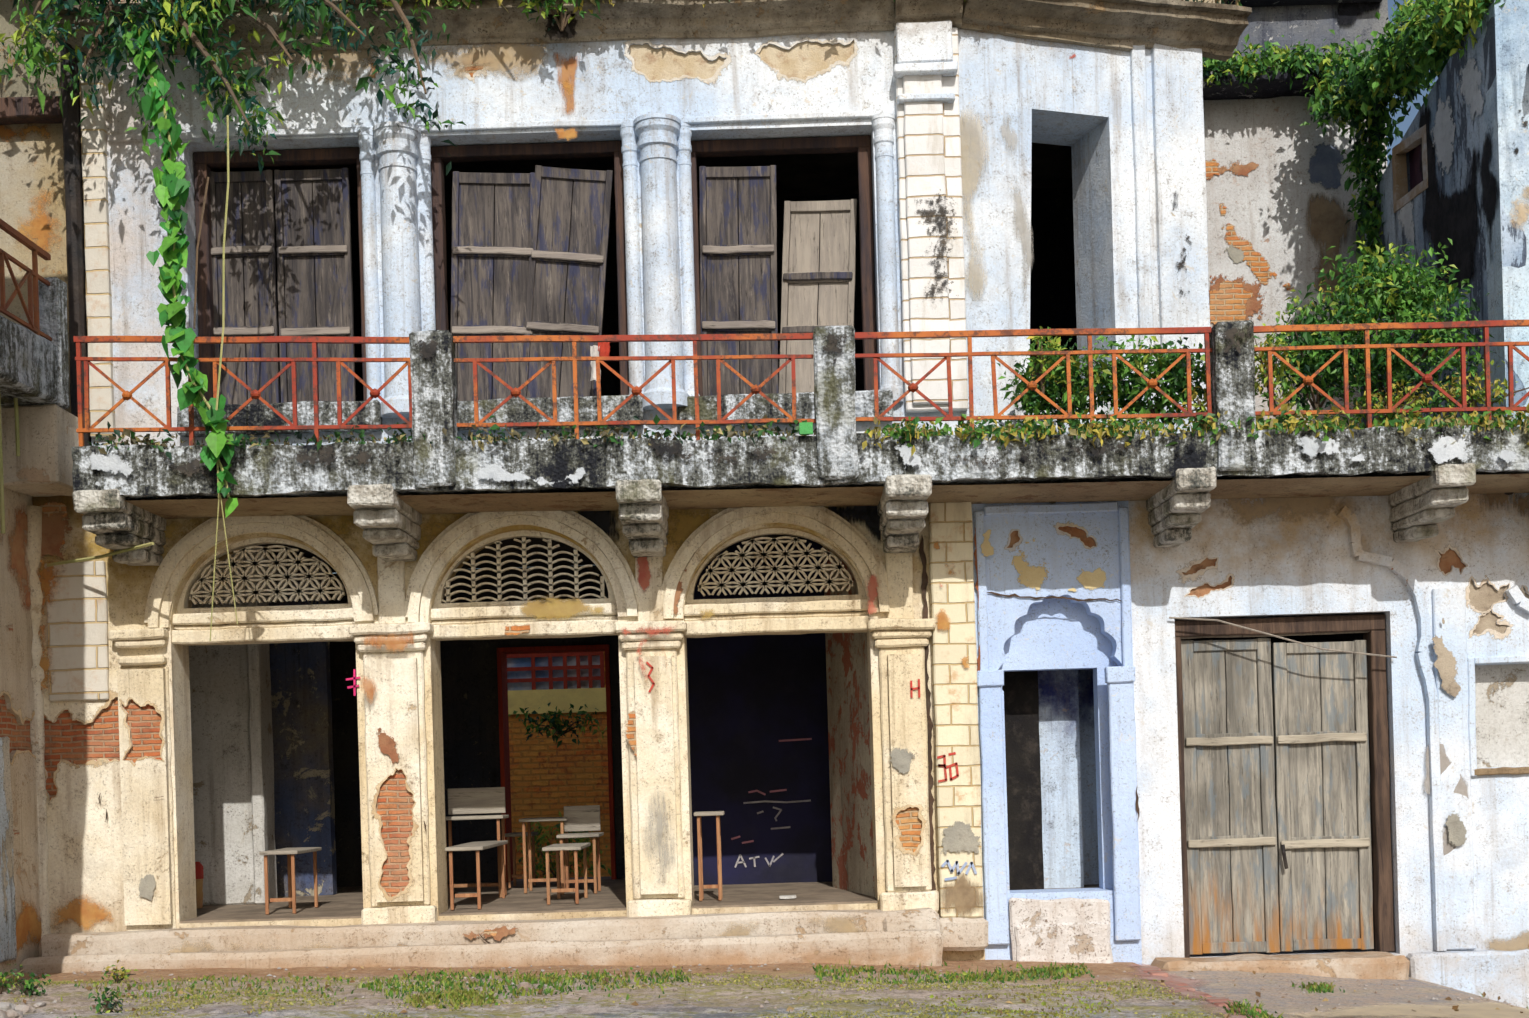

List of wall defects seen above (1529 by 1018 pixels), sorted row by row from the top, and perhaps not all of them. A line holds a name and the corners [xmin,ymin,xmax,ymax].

peeling [624,39,732,85]
peeling [754,37,859,83]
flaking render [1205,159,1259,180]
damp [1419,107,1529,297]
flaking render [1209,203,1295,325]
peeling [1176,556,1235,598]
peeling [1431,541,1529,642]
peeling [1432,618,1461,697]
flaking render [0,690,165,803]
flaking render [371,728,419,901]
flaking render [891,804,926,856]